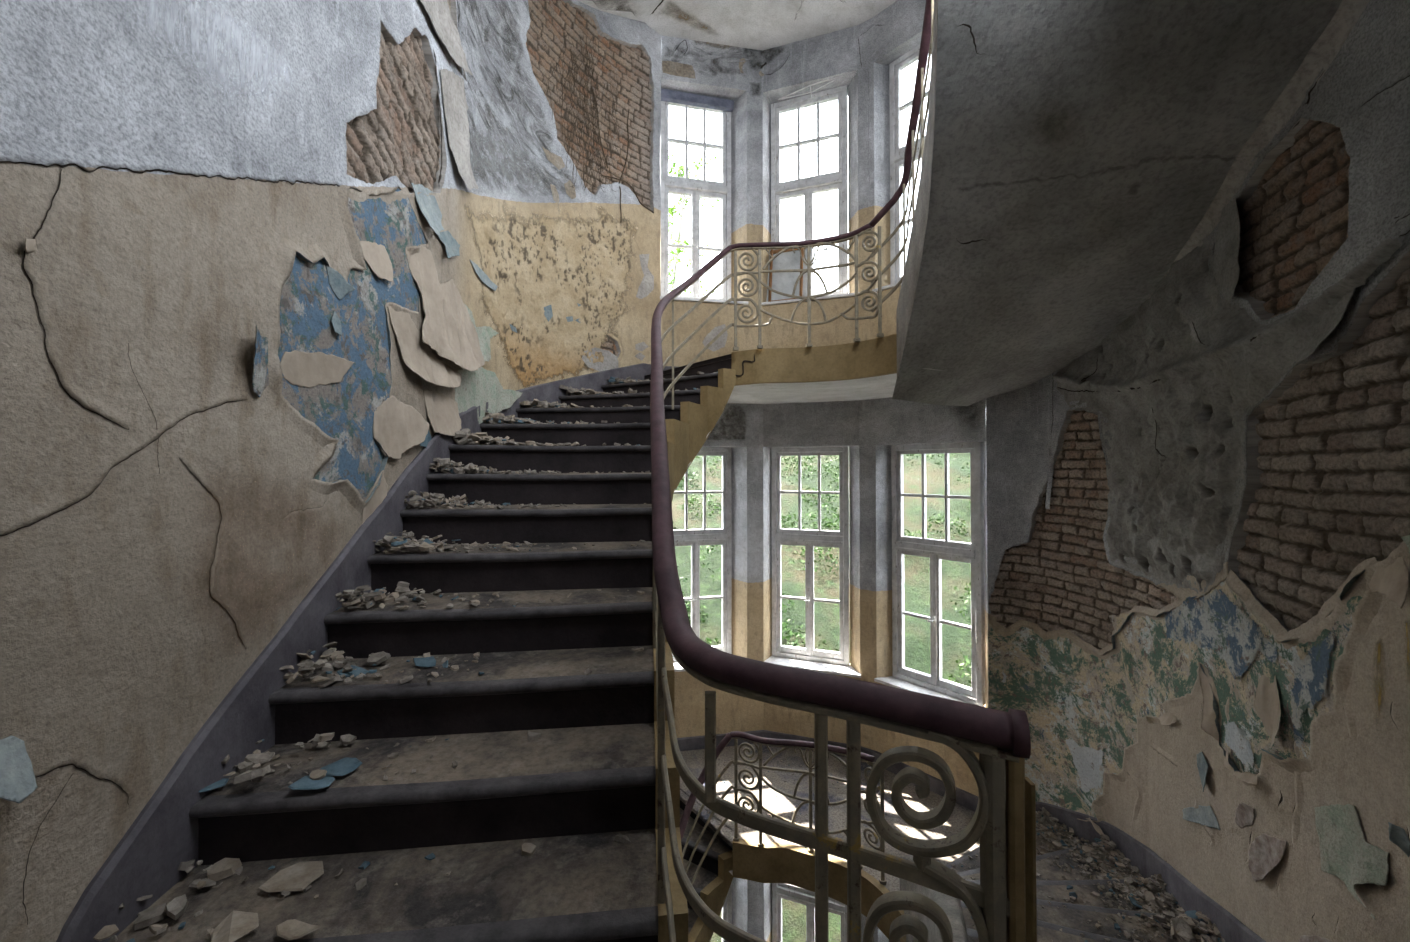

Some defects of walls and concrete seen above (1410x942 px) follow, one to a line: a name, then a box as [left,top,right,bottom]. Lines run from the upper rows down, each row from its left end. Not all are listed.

flaking render [420,0,478,191]
leakage [457,0,573,188]
crack [957,24,981,55]
flaking render [542,147,576,204]
flaking render [1213,197,1240,302]
peeling [252,174,522,524]
flaking render [582,329,649,371]
flaking render [1292,289,1355,365]
peeling [987,535,1410,882]
crack [22,749,138,925]
peeling [1314,804,1410,920]